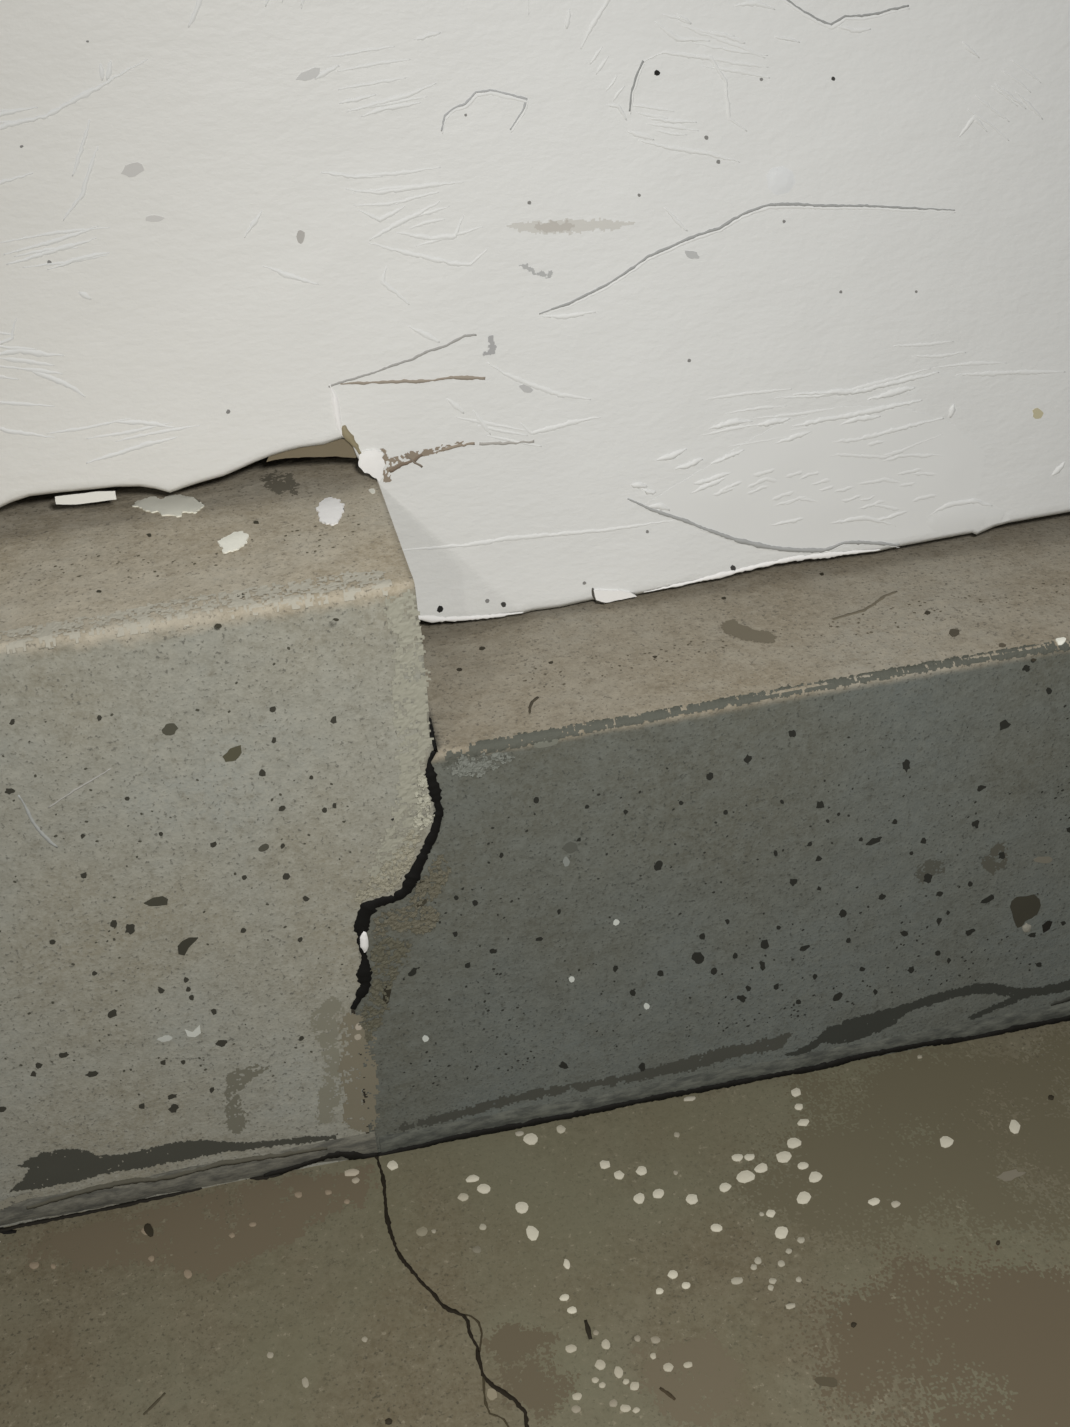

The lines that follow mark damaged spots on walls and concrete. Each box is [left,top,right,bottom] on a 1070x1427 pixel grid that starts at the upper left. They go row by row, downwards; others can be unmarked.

crack [787,0,909,26]
crack [539,202,956,316]
peeling [267,425,385,482]
damp [10,996,345,1210]
crack [246,717,1070,1427]
damp [394,979,1070,1132]
damp [726,1021,1070,1269]
crack [0,1187,202,1234]
damp [481,1322,581,1427]